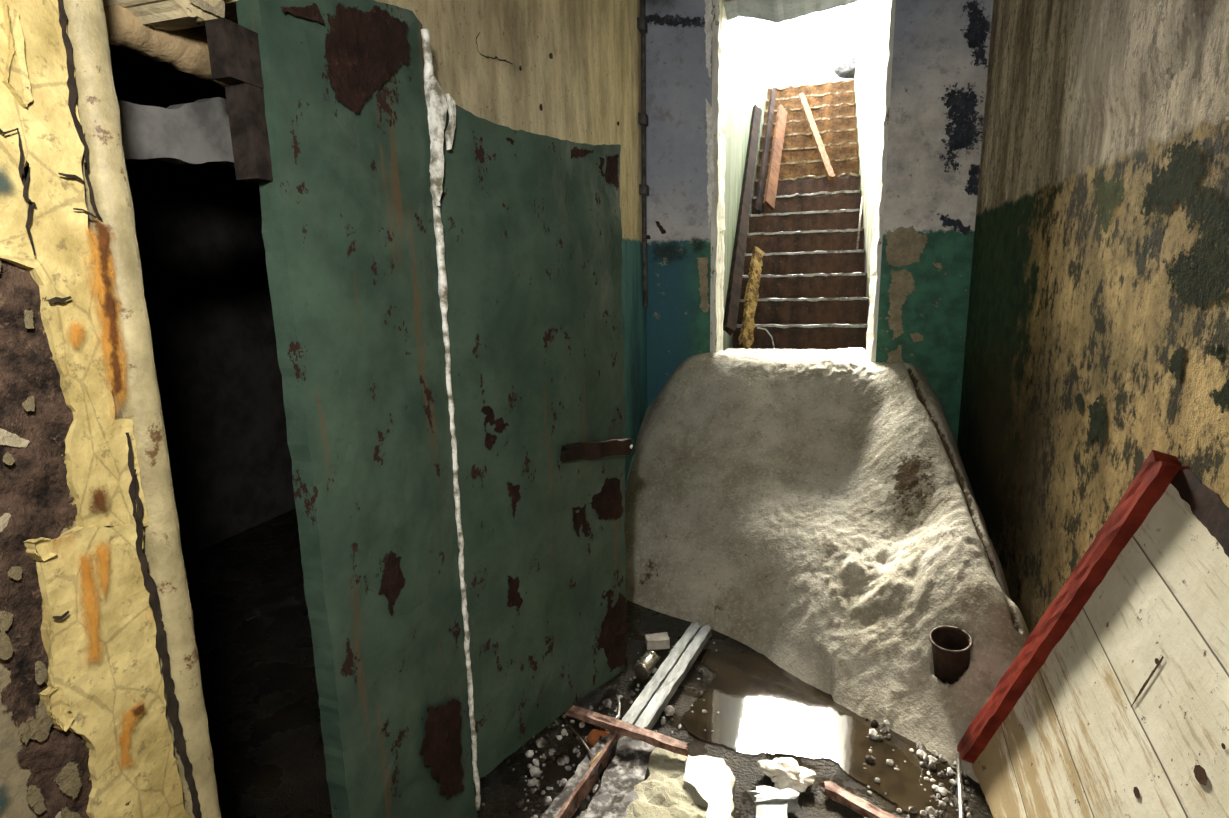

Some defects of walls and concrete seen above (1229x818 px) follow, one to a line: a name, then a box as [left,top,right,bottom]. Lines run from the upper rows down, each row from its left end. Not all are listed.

crack [0,0,102,256]
peeling [885,226,928,363]
peeling [1091,170,1125,236]
peeling [1136,134,1229,310]
peeling [0,0,191,818]